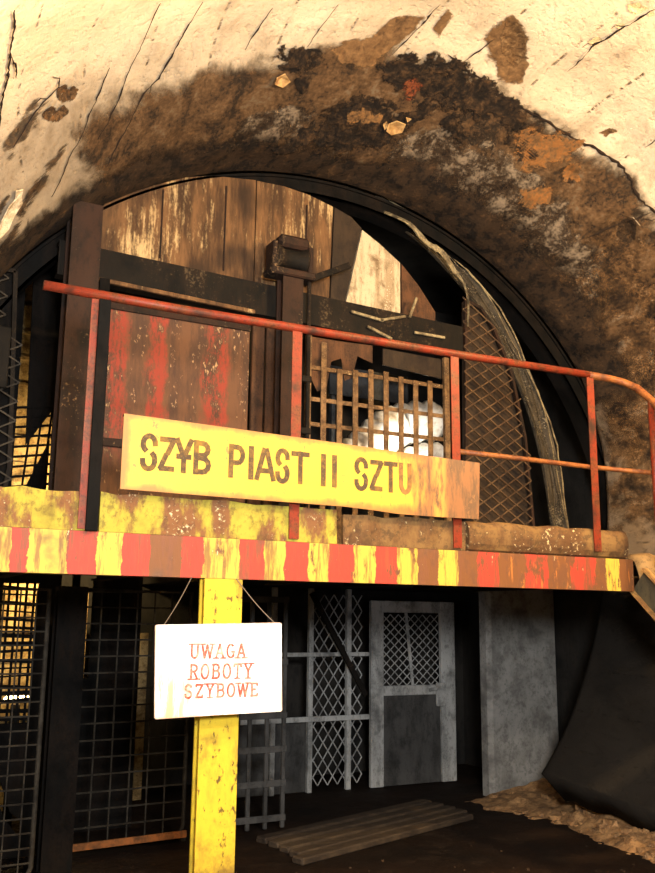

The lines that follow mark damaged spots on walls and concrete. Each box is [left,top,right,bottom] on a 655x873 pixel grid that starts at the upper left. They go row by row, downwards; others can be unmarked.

crack [0,10,17,124]
water stain [433,9,452,36]
spalling [500,22,526,68]
crack [13,77,60,148]
spalling [42,85,78,123]
crack [449,39,655,240]
water stain [75,15,655,534]